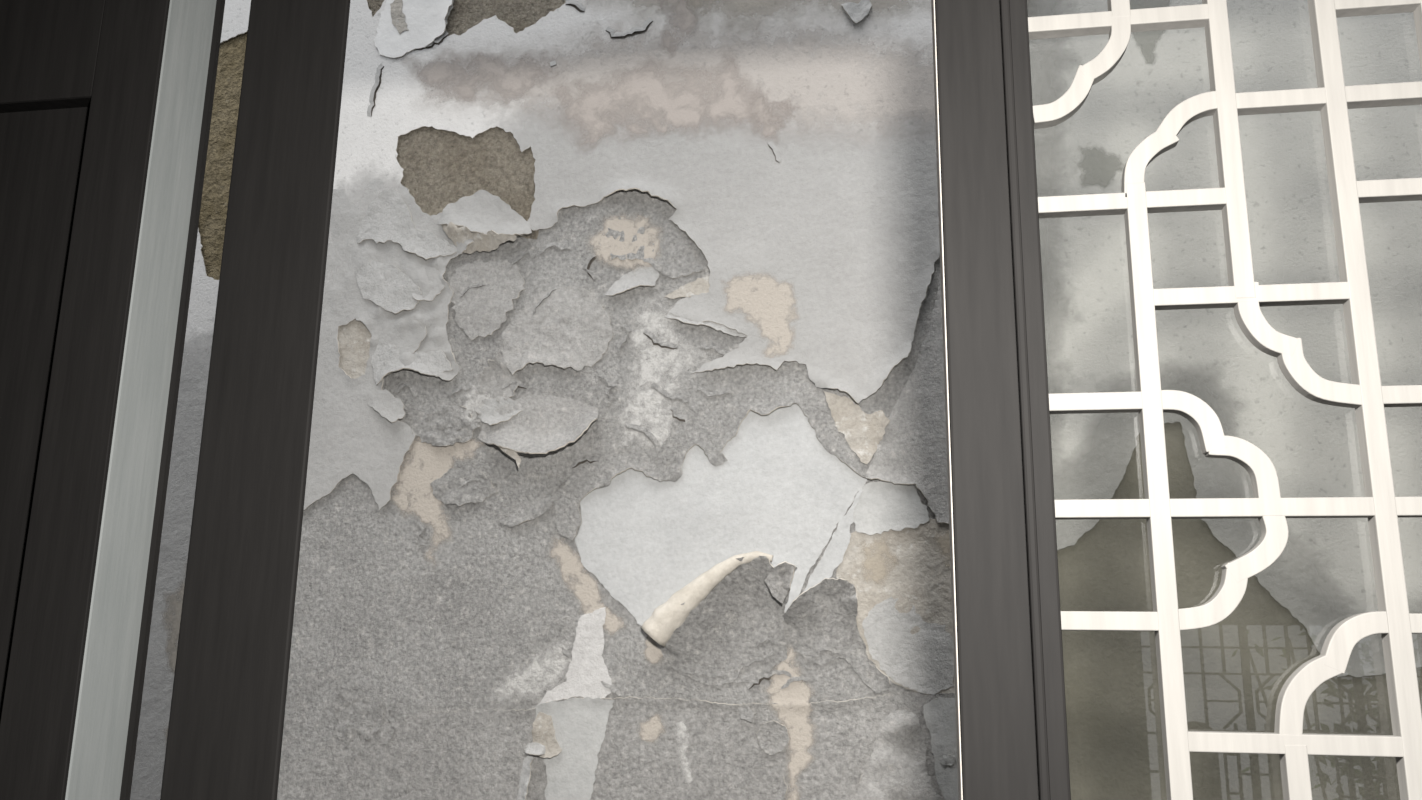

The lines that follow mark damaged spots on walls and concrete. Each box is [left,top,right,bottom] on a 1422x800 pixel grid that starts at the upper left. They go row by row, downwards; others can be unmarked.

peeling [367,0,566,58]
leakage [417,0,935,143]
peeling [1029,37,1065,106]
spalling [198,30,248,280]
peeling [1034,125,1060,197]
peeling [1039,218,1068,394]
peeling [1160,368,1233,436]
peeling [277,106,959,800]
peeling [1050,412,1145,500]
peeling [1163,413,1249,499]
peeling [130,335,213,800]
peeling [1412,634,1422,713]